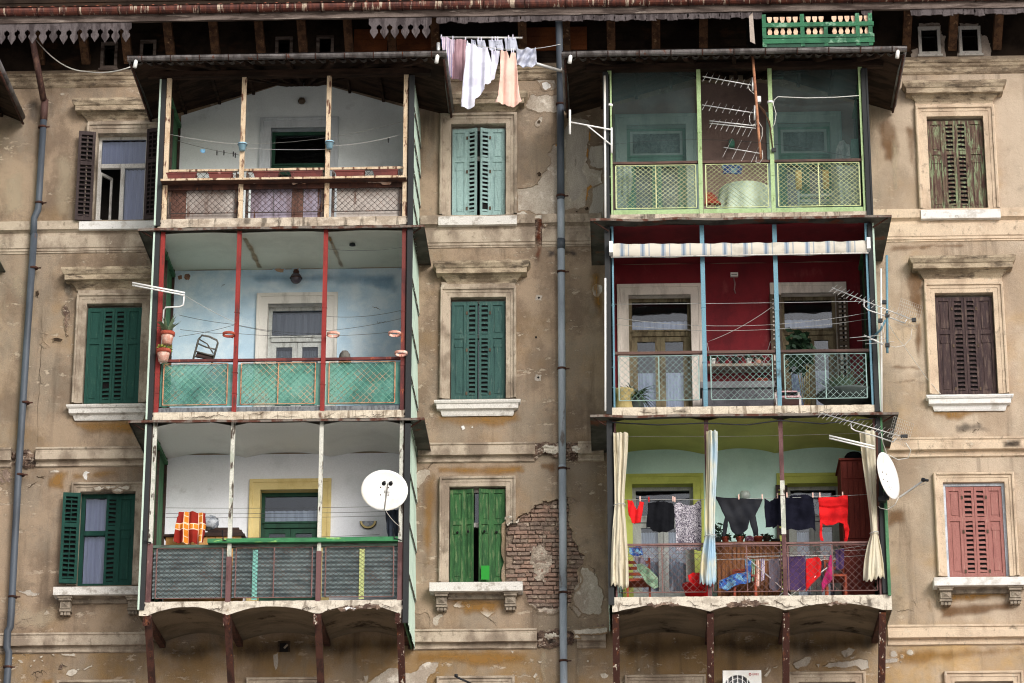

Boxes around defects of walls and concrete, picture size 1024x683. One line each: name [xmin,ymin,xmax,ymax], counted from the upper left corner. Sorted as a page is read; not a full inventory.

flaking render [525,80,557,128]
flaking render [516,117,604,245]
flaking render [501,484,609,679]
spalling [338,603,381,611]
flaking render [363,661,440,683]